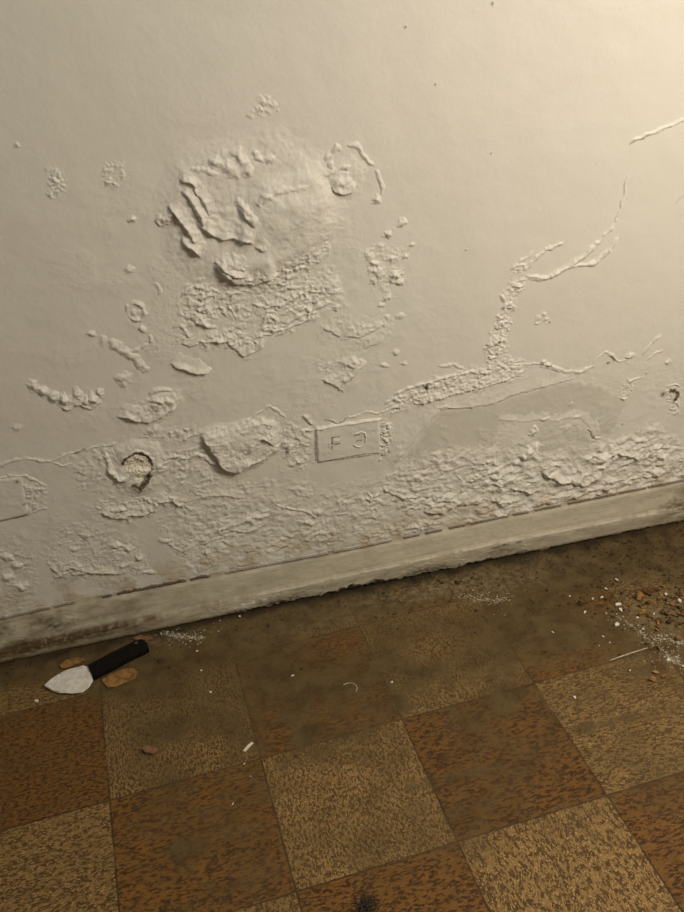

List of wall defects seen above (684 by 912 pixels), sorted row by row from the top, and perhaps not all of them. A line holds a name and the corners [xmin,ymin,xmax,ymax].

spalling [101,438,170,498]
damp [205,545,550,619]
damp [0,610,165,662]